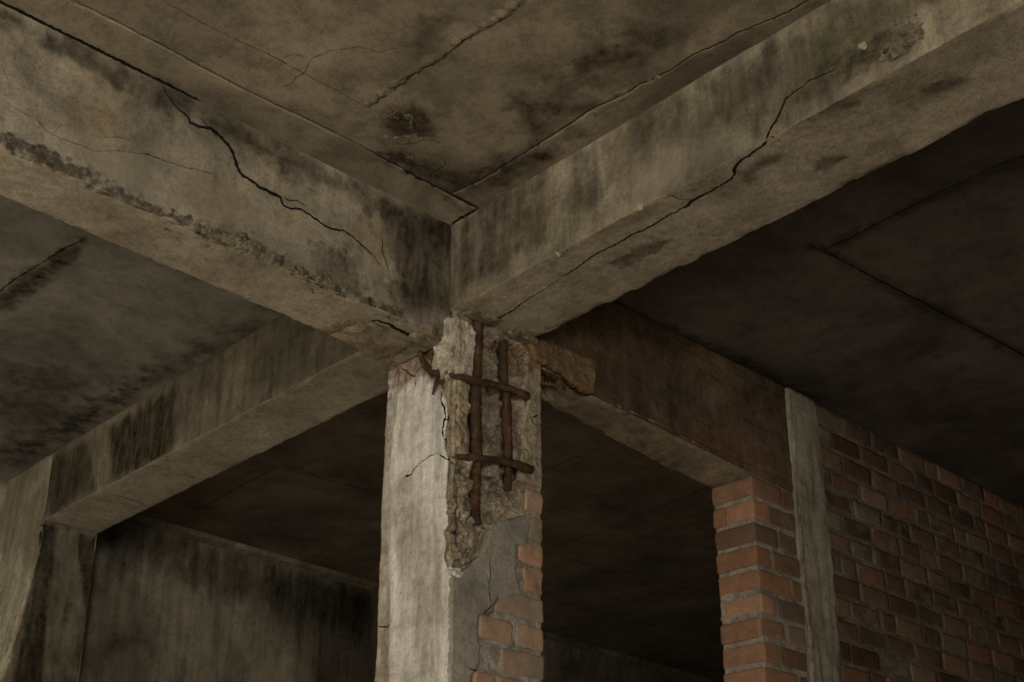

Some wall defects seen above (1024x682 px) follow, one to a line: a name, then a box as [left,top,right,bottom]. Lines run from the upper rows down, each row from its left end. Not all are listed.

flaking render [878,13,924,62]
crack [0,239,82,291]
crack [22,84,388,269]
crack [498,69,835,319]
crack [403,391,464,479]
spalling [443,306,544,682]